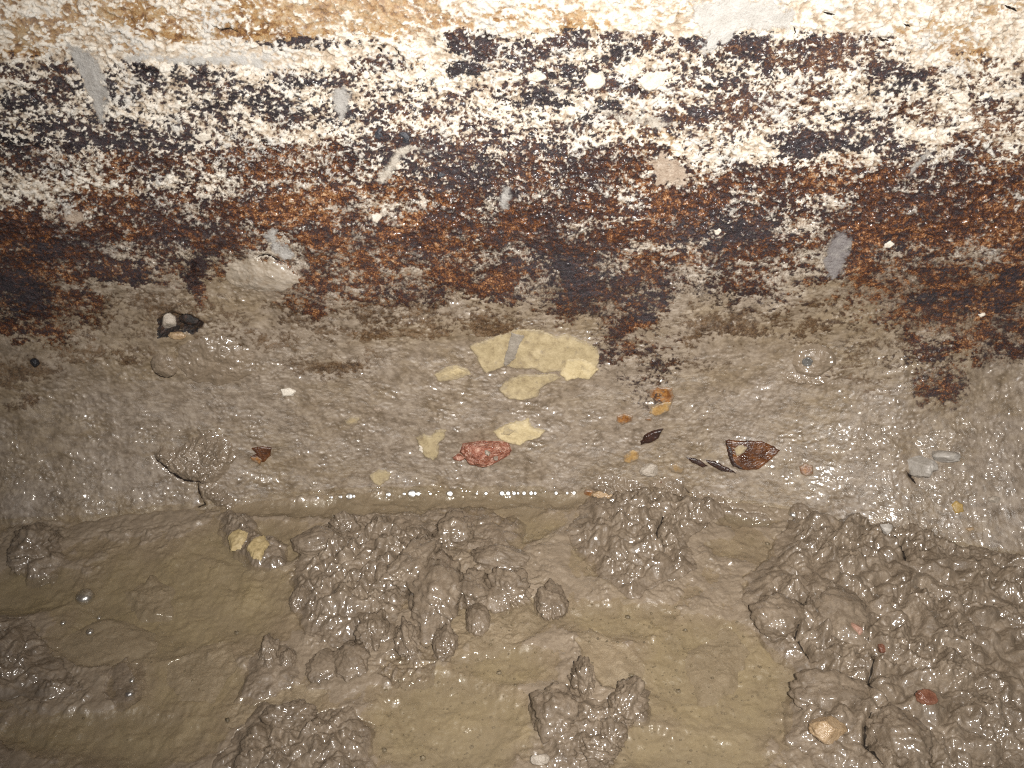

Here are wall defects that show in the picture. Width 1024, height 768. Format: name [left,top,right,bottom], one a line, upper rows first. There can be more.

rust [0,128,1024,465]